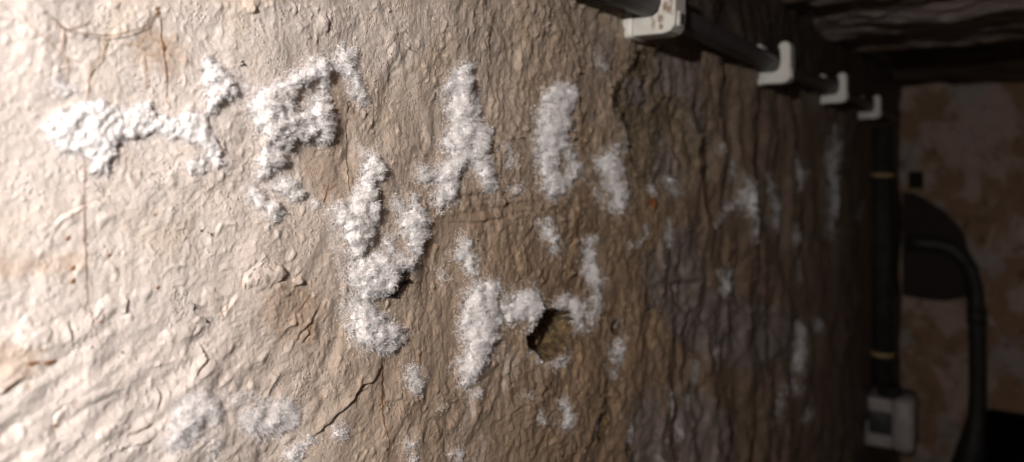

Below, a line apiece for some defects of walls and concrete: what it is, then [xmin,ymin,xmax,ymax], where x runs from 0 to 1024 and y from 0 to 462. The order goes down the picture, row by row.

water stain [37,31,633,418]
spalling [526,307,574,362]
crack [311,367,382,438]